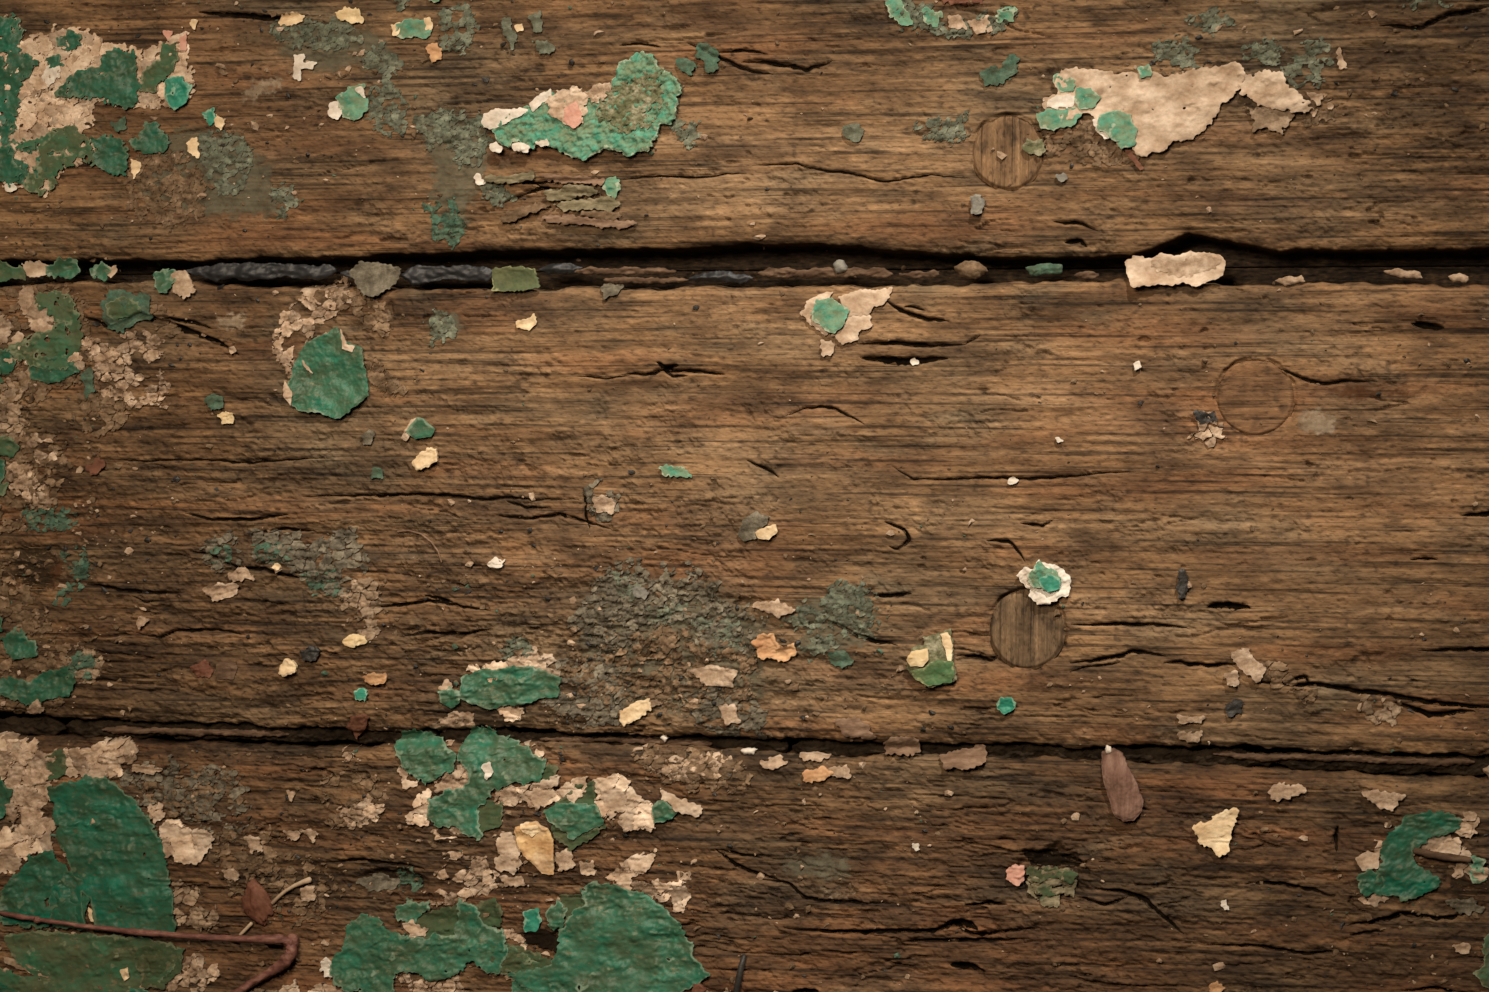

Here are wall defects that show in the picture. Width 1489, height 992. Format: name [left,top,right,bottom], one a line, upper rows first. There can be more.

peeling [0,13,225,198]
peeling [1022,34,1335,182]
peeling [272,261,420,419]
peeling [491,266,541,292]
peeling [800,287,893,357]
peeling [0,257,196,714]
peeling [401,417,438,470]
peeling [199,526,389,648]
peeling [0,557,854,992]
peeling [939,744,988,770]
peeling [1268,782,1307,802]
peeling [1355,789,1487,908]